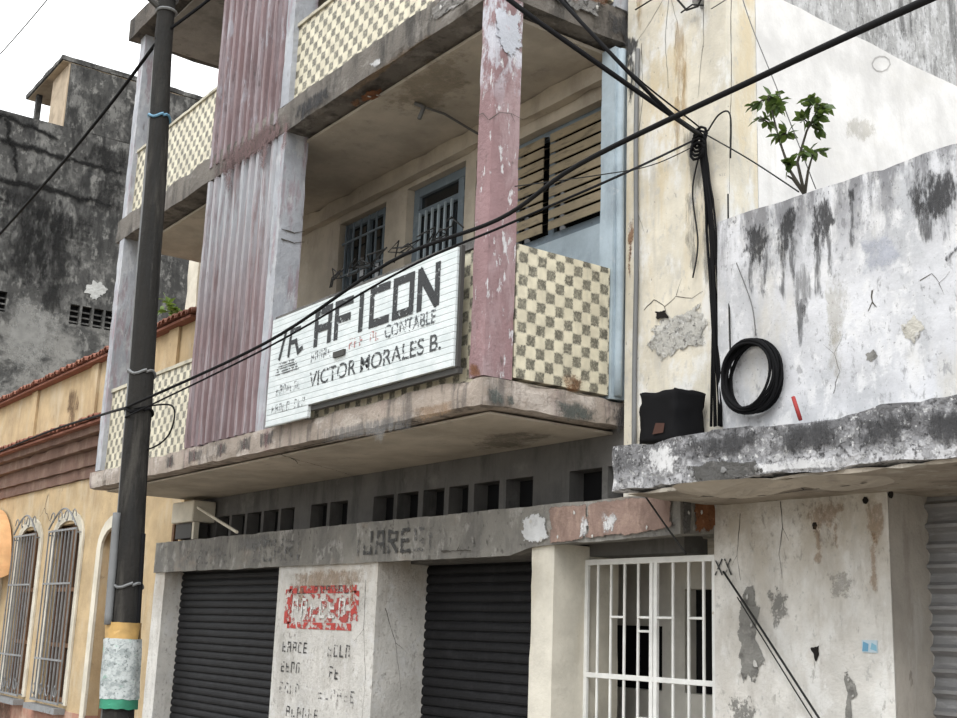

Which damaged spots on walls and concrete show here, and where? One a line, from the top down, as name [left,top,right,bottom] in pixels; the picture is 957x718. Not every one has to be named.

peeling [495,8,523,57]
leakage [910,171,957,240]
leakage [0,187,91,364]
leakage [743,207,797,293]
leakage [812,198,835,294]
flaking render [647,304,708,361]
leakage [614,404,624,432]
leakage [746,420,840,476]
peeling [521,497,717,543]
peeling [737,586,788,683]
peeling [729,696,757,718]
peeling [844,671,858,718]